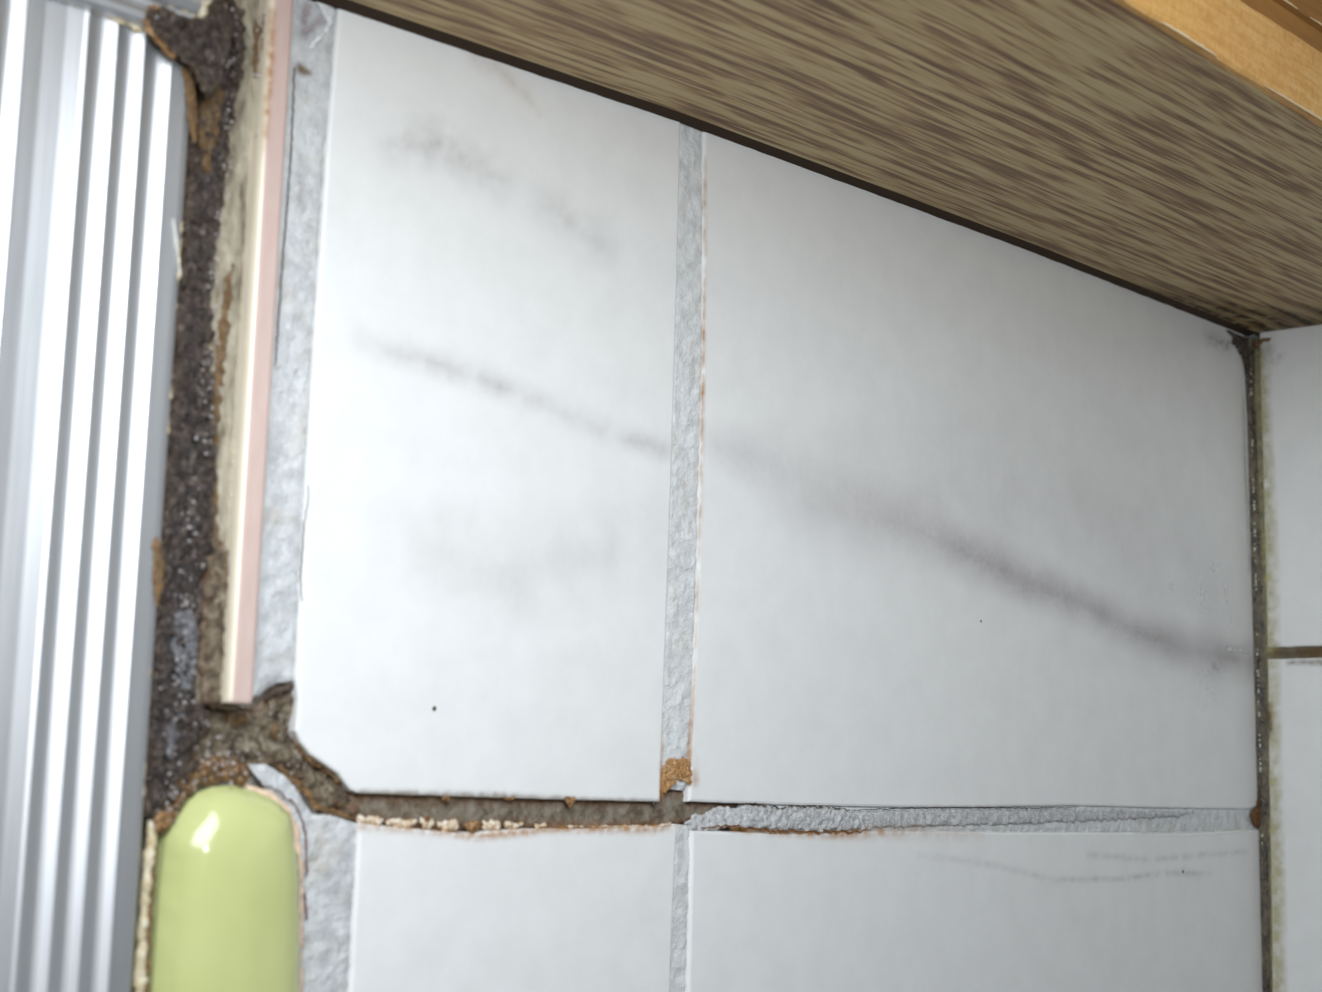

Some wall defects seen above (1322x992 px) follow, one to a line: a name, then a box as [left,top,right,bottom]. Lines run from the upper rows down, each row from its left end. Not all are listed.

corrosion [253,15,273,77]
corrosion [154,736,259,833]
corrosion [660,721,693,793]
corrosion [464,820,484,834]